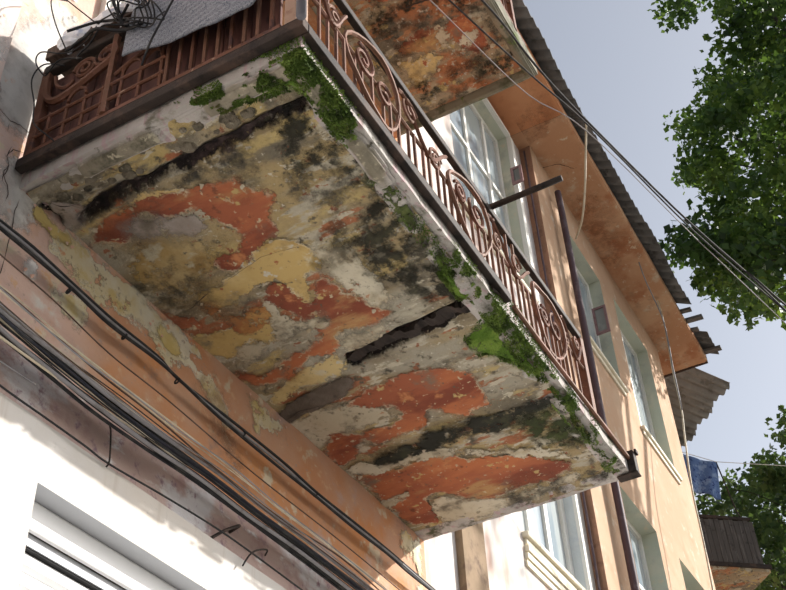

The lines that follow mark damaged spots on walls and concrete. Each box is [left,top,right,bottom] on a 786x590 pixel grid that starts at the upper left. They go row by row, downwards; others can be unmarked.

peeling [0,10,78,142]
peeling [396,11,495,88]
damp [265,97,360,184]
damp [332,191,456,308]
peeling [0,96,580,526]
damp [373,396,586,466]